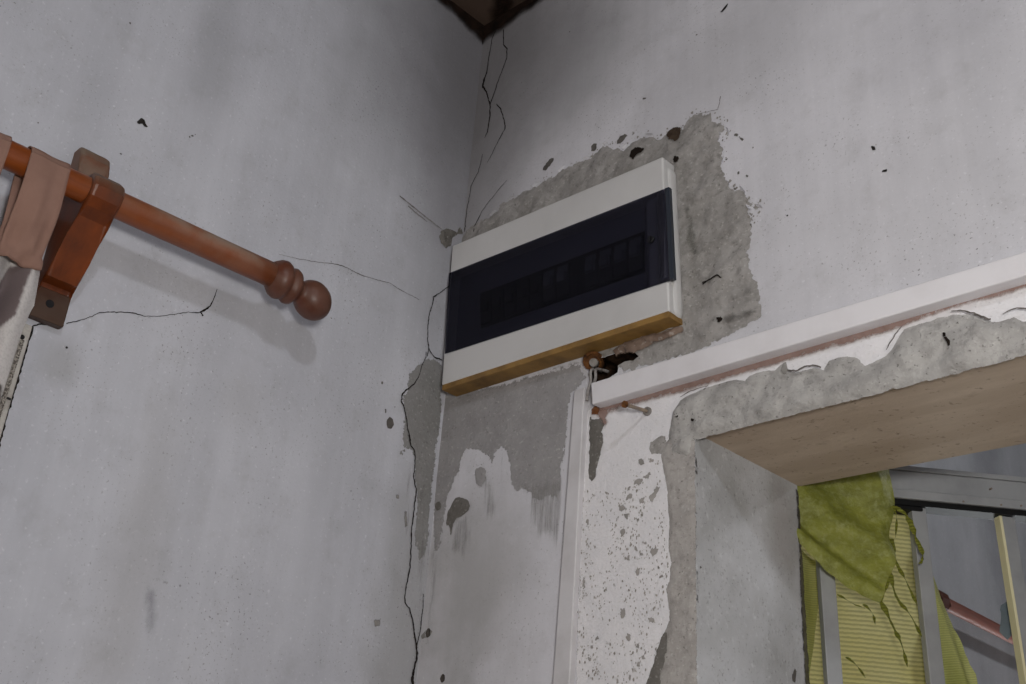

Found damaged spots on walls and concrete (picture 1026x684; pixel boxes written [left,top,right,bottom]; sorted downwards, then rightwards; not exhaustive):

crack [464,29,508,232]
crack [0,290,217,447]
spalling [385,108,765,560]
spalling [577,417,669,684]